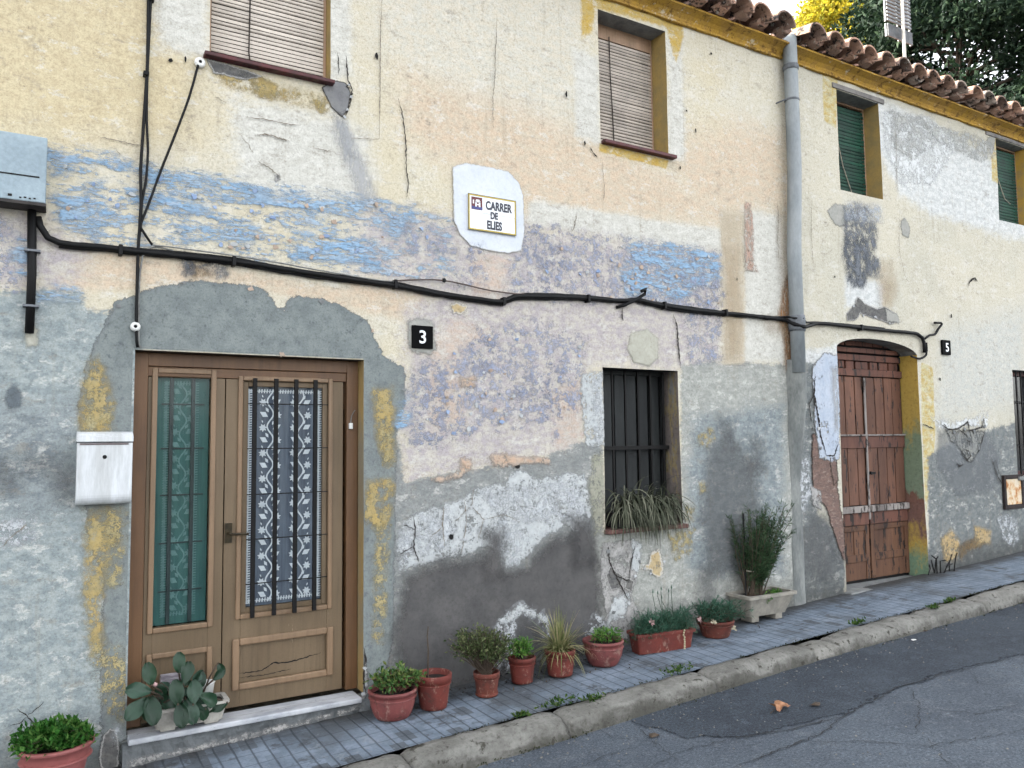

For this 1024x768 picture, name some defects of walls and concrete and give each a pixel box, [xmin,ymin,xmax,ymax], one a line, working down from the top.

crack [337,2,409,197]
peeling [46,147,487,288]
peeling [510,224,724,363]
flaking render [847,297,900,325]
peeling [80,359,116,432]
peeling [83,507,368,768]
peeling [365,479,394,643]
crack [401,489,519,560]
damp [394,470,602,688]
peeling [372,318,666,639]
crack [608,544,636,601]
flaking render [800,352,846,560]